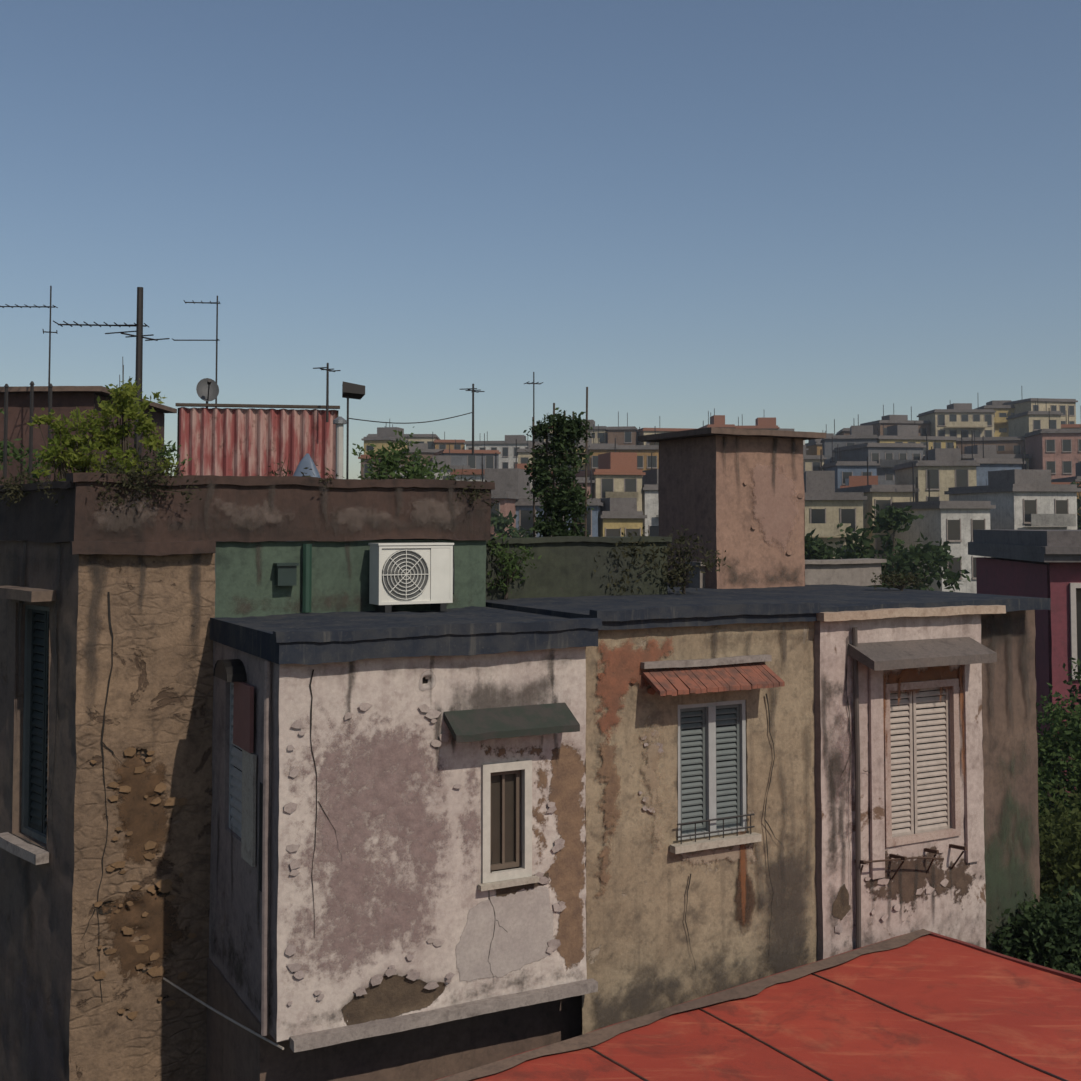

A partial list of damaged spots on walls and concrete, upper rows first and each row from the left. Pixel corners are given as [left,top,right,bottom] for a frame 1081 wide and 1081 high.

crack [82,592,129,1002]
crack [309,669,342,936]
peeling [282,703,476,1025]
peeling [459,812,481,853]
spalling [481,637,673,970]
rust [736,834,756,931]
spalling [865,846,984,922]